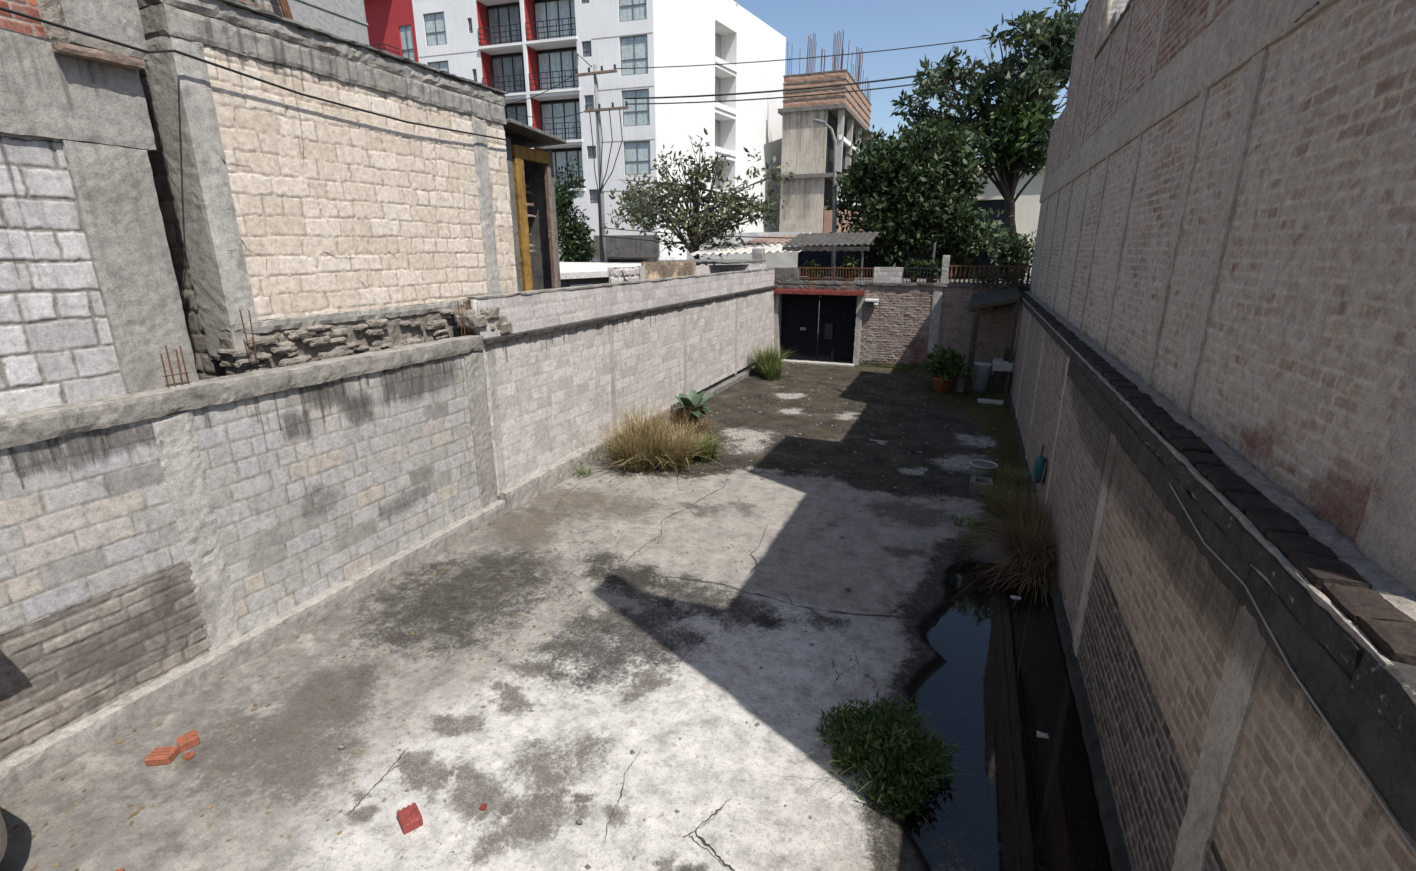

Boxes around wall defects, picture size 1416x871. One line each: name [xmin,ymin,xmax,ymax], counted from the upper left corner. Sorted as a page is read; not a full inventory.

spalling [239,309,257,359]
damp [9,424,162,489]
crack [603,751,640,849]
crack [683,799,735,871]